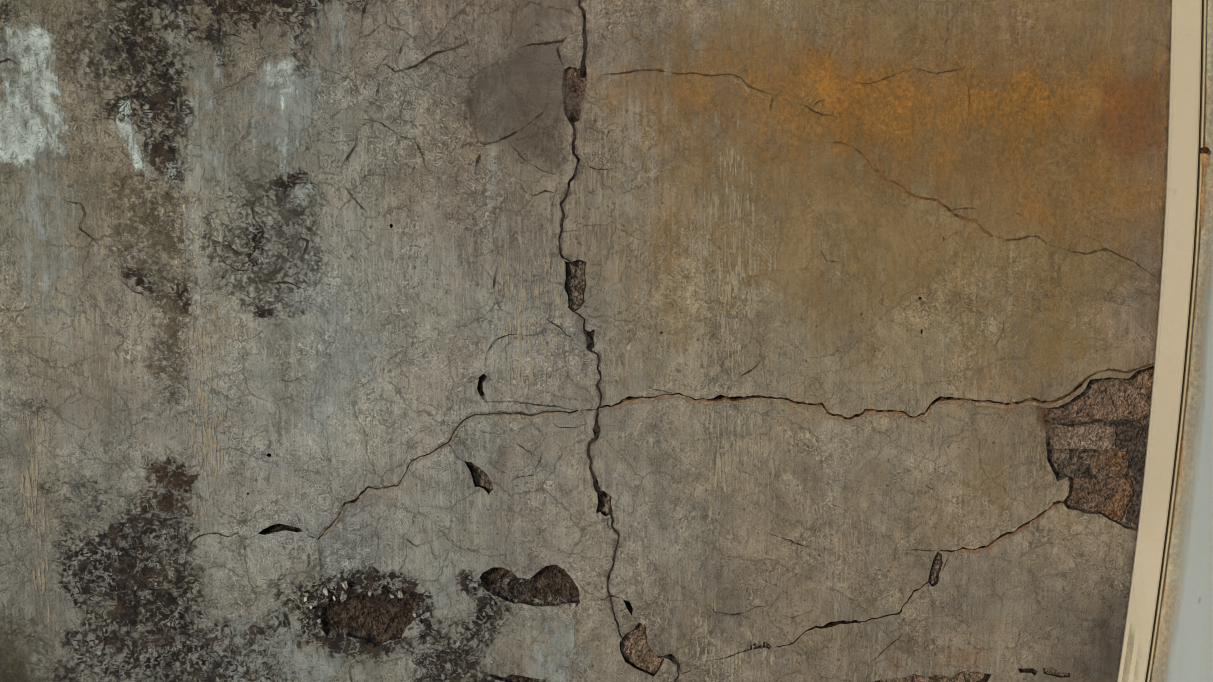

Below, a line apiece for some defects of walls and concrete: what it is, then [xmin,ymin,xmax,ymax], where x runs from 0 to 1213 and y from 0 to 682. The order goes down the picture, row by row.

crack [341,44,463,212]
crack [475,0,773,266]
crack [805,100,1044,241]
water stain [0,0,523,682]
spalling [564,260,586,312]
spalling [464,461,493,494]
crack [307,308,1151,641]
spalling [1040,365,1154,531]
spalling [304,573,420,648]
spalling [469,565,580,682]
spalling [620,600,664,676]
crack [657,500,1064,682]